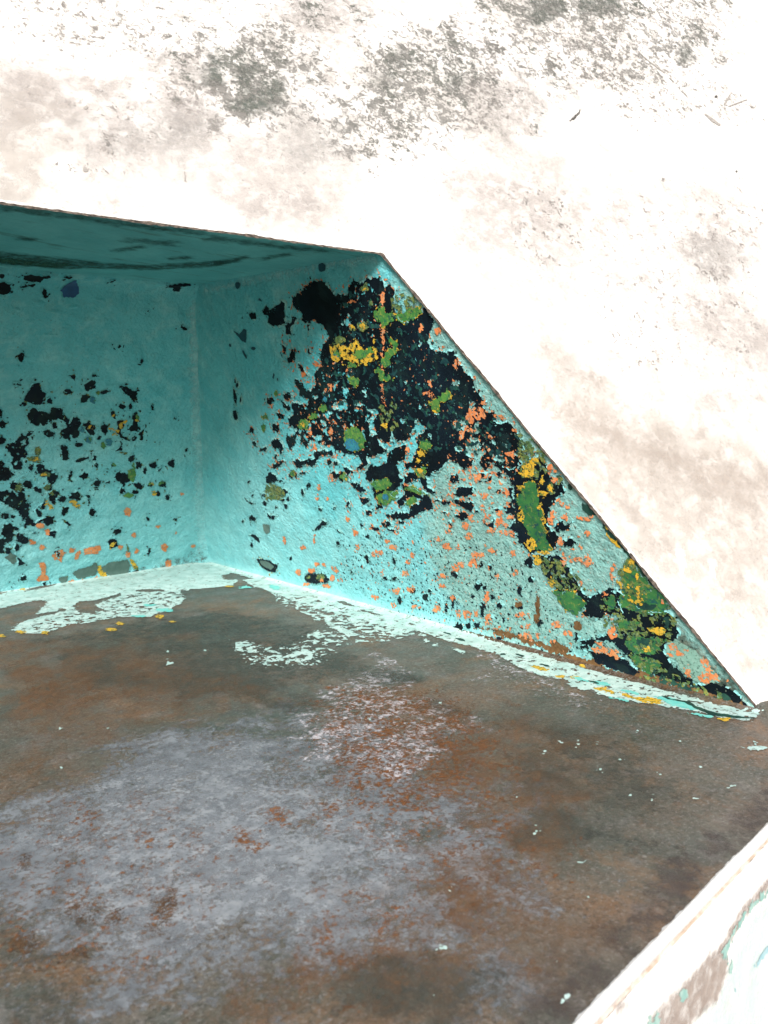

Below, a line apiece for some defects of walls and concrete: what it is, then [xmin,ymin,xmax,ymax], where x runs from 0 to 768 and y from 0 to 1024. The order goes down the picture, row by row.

peeling [0,202,763,721]
corrosion [0,682,574,1004]